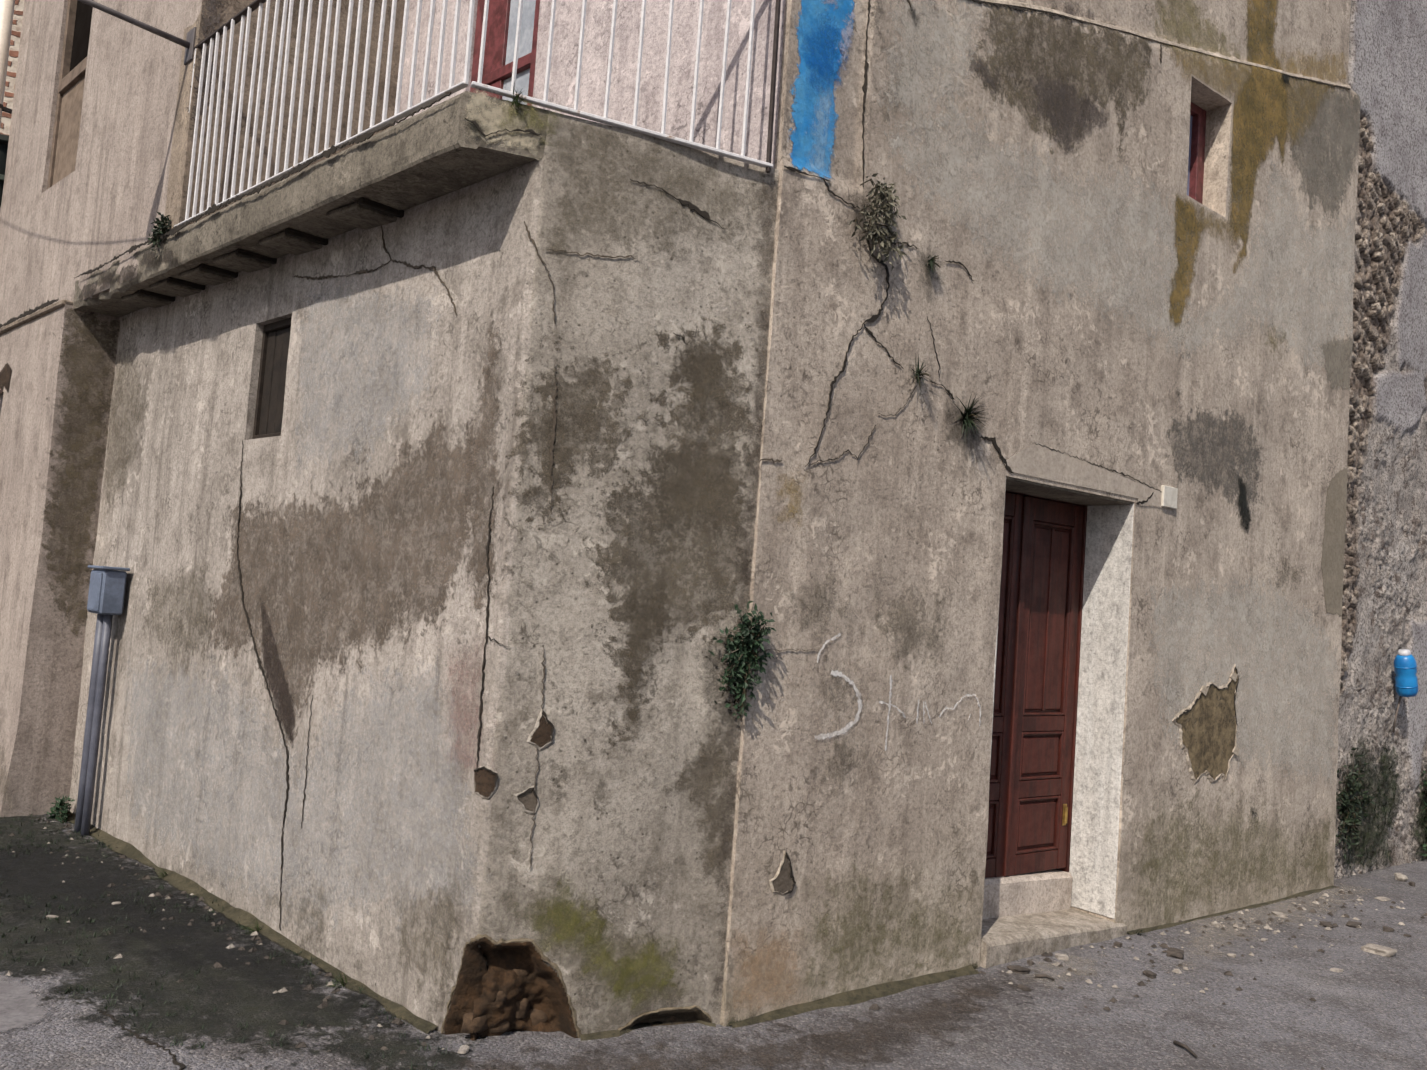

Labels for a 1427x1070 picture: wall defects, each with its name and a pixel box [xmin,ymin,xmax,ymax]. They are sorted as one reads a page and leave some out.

crack [0,92,541,328]
crack [756,0,974,467]
leakage [970,0,1361,326]
leakage [206,312,512,747]
leakage [582,294,772,753]
crack [980,436,1162,504]
leakage [1165,405,1261,516]
crack [237,441,313,931]
spalling [474,765,498,800]
spalling [526,709,555,751]
spalling [1172,663,1240,784]
spalling [441,934,581,1055]